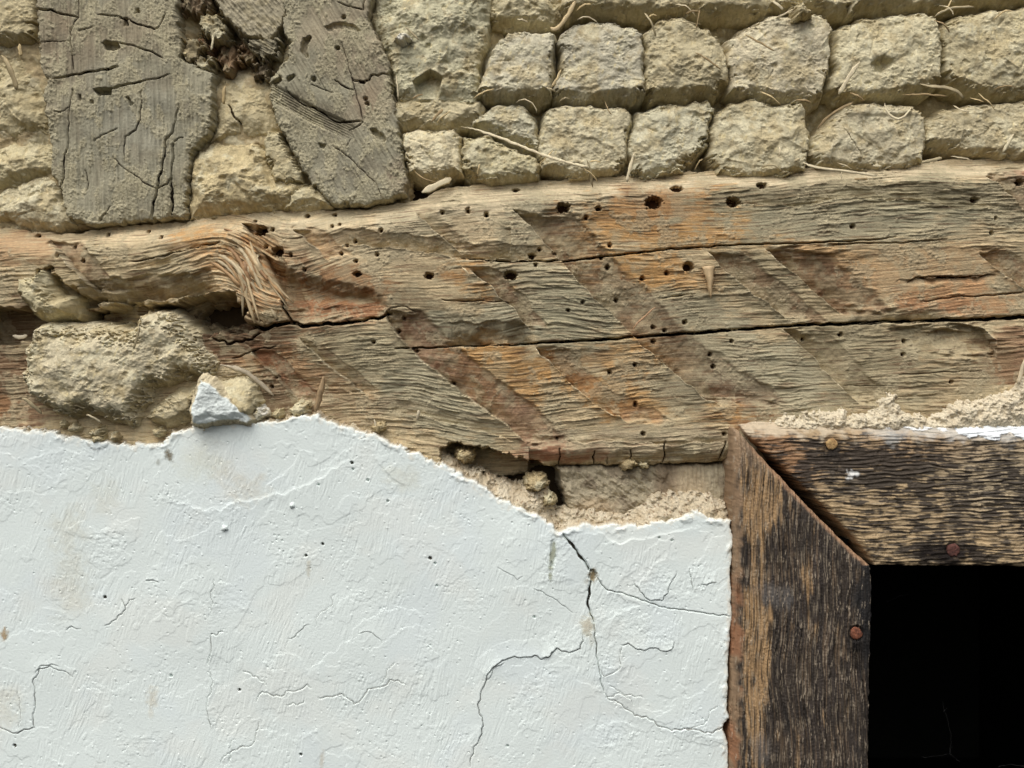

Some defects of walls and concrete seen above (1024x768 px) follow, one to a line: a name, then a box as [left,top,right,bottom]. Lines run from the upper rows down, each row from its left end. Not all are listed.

spalling [189,372,266,431]
spalling [441,448,728,528]
crack [470,534,727,767]
crack [2,664,67,734]